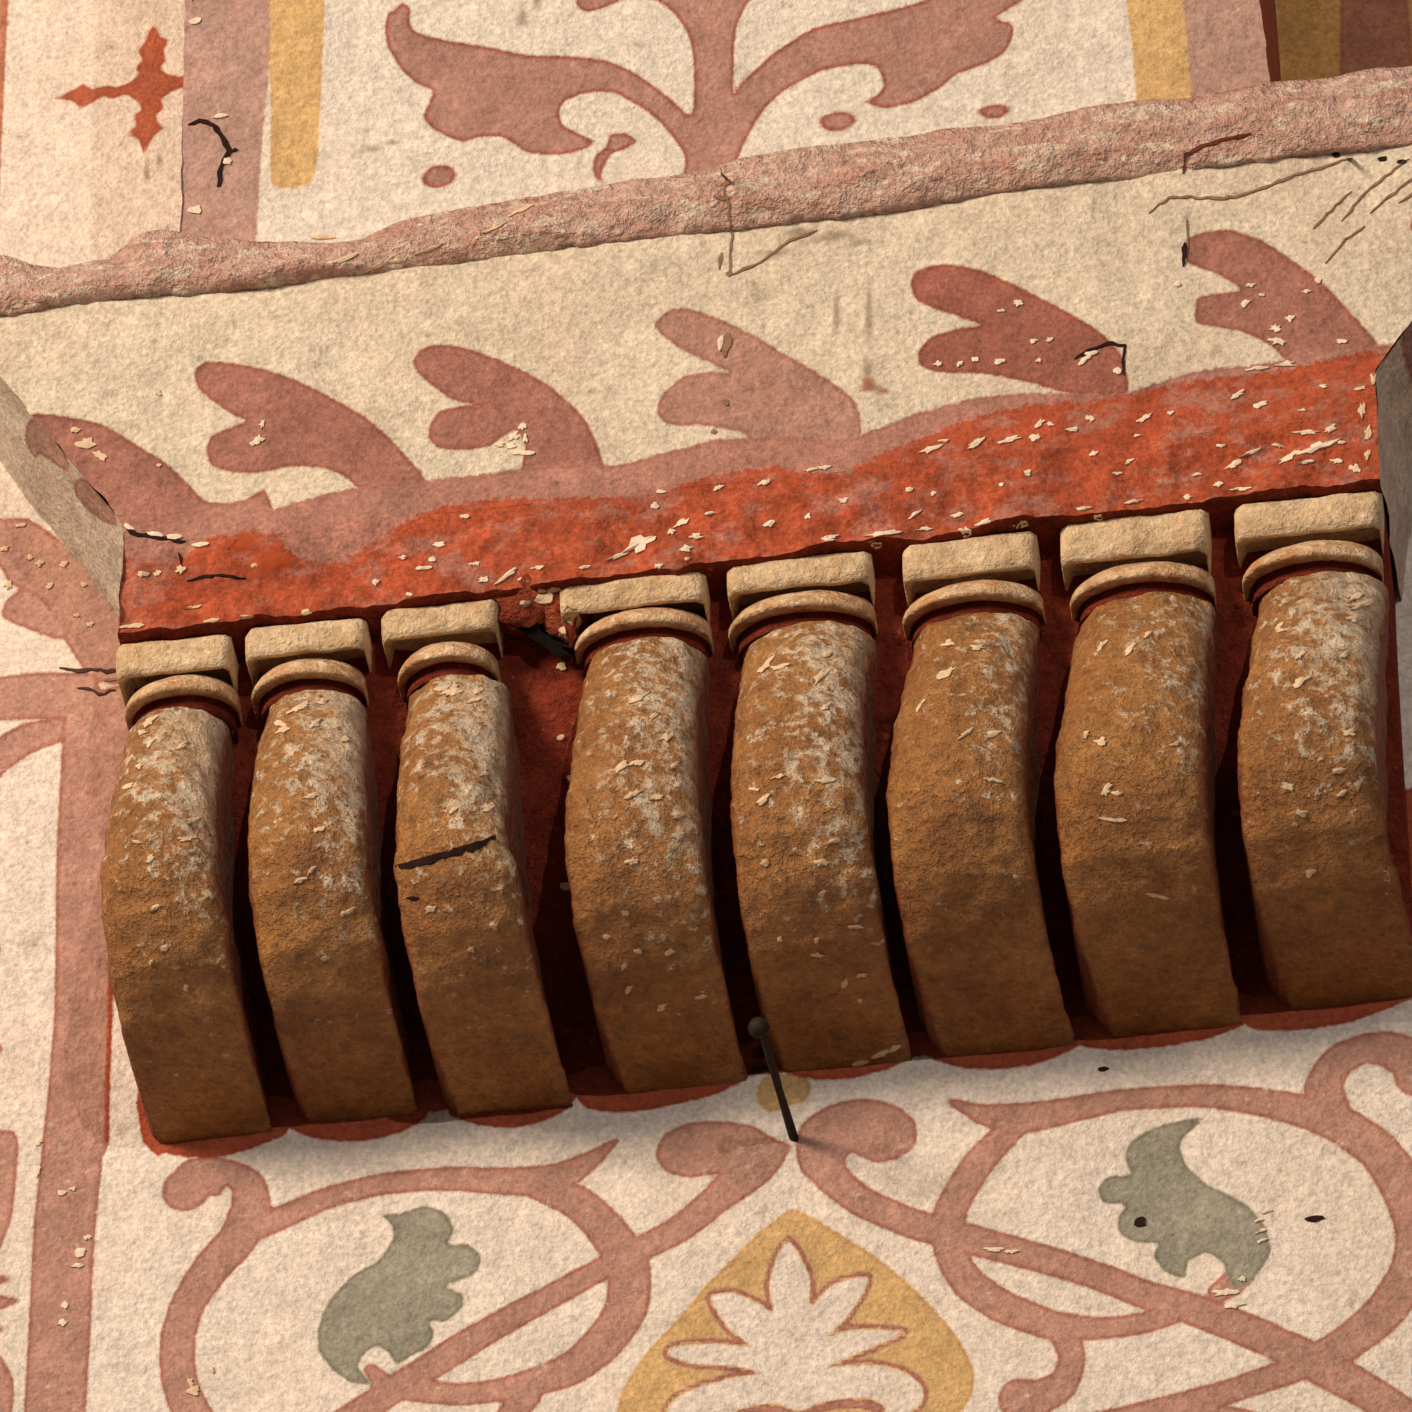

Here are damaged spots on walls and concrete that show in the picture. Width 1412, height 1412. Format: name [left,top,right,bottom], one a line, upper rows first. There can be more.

crack [187,113,238,215]
crack [715,168,817,277]
crack [1149,133,1353,287]
crack [717,332,732,357]
crack [1074,341,1126,375]
peeling [967,415,1095,450]
peeling [1191,373,1377,492]
peeling [398,542,446,571]
peeling [606,511,716,561]
peeling [863,491,936,549]
peeling [950,512,991,538]
crack [395,835,497,901]